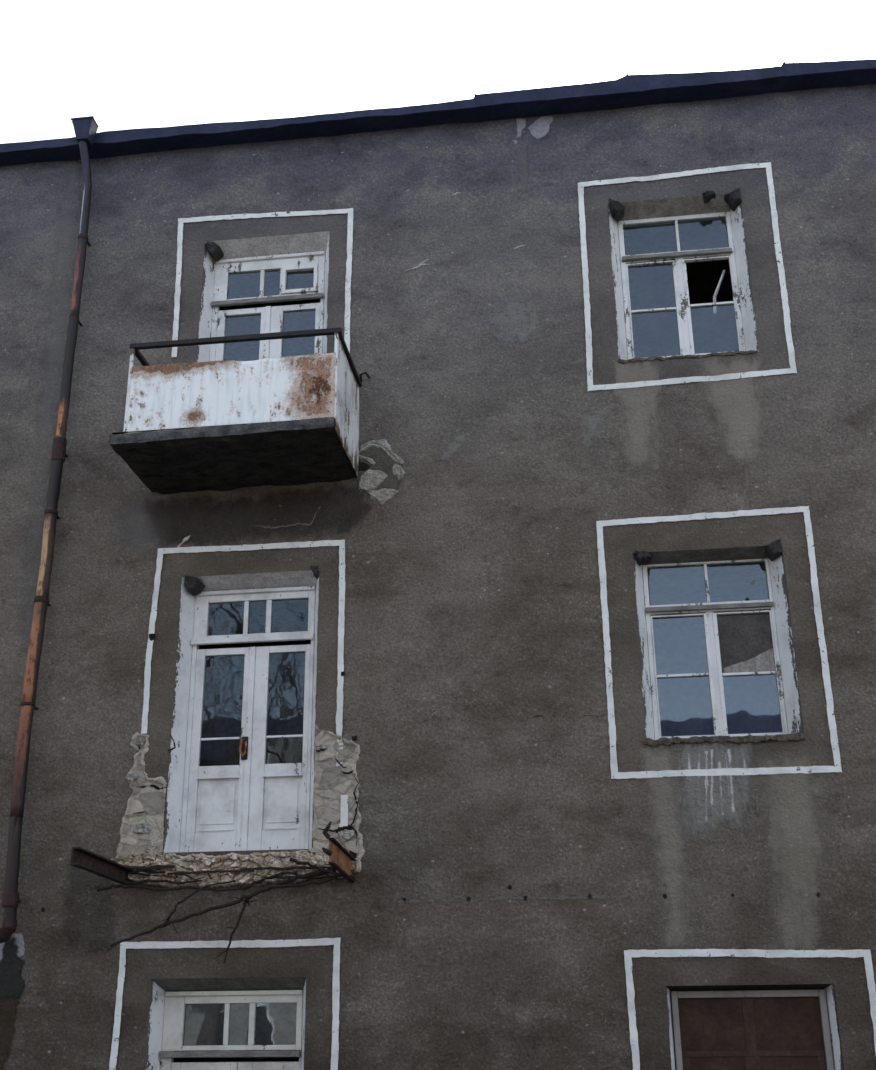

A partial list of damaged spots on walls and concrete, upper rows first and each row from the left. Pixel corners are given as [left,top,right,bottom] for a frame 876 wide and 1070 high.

peeling [513,116,553,191]
corrosion [130,360,235,379]
corrosion [184,398,205,425]
corrosion [282,353,336,419]
peeling [355,439,405,505]
spalling [111,724,365,888]
damp [638,741,825,950]
damp [0,933,25,1070]